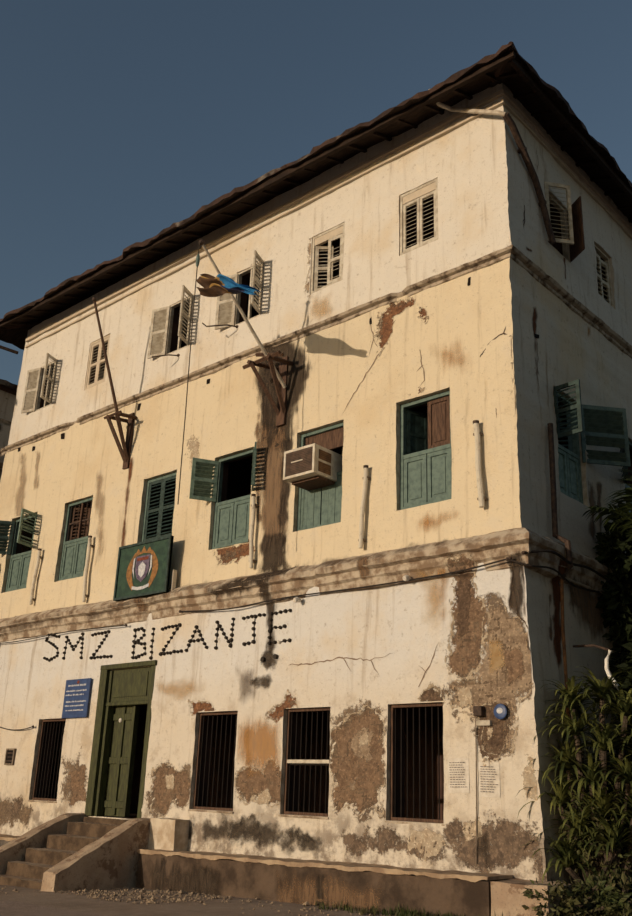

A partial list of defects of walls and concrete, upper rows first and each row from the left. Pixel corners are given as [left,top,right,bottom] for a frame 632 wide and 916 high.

peeling [369,298,429,356]
water stain [199,336,309,694]
water stain [89,593,166,618]
peeling [418,553,534,766]
peeling [145,762,191,818]
peeling [234,759,281,807]
peeling [330,699,387,823]